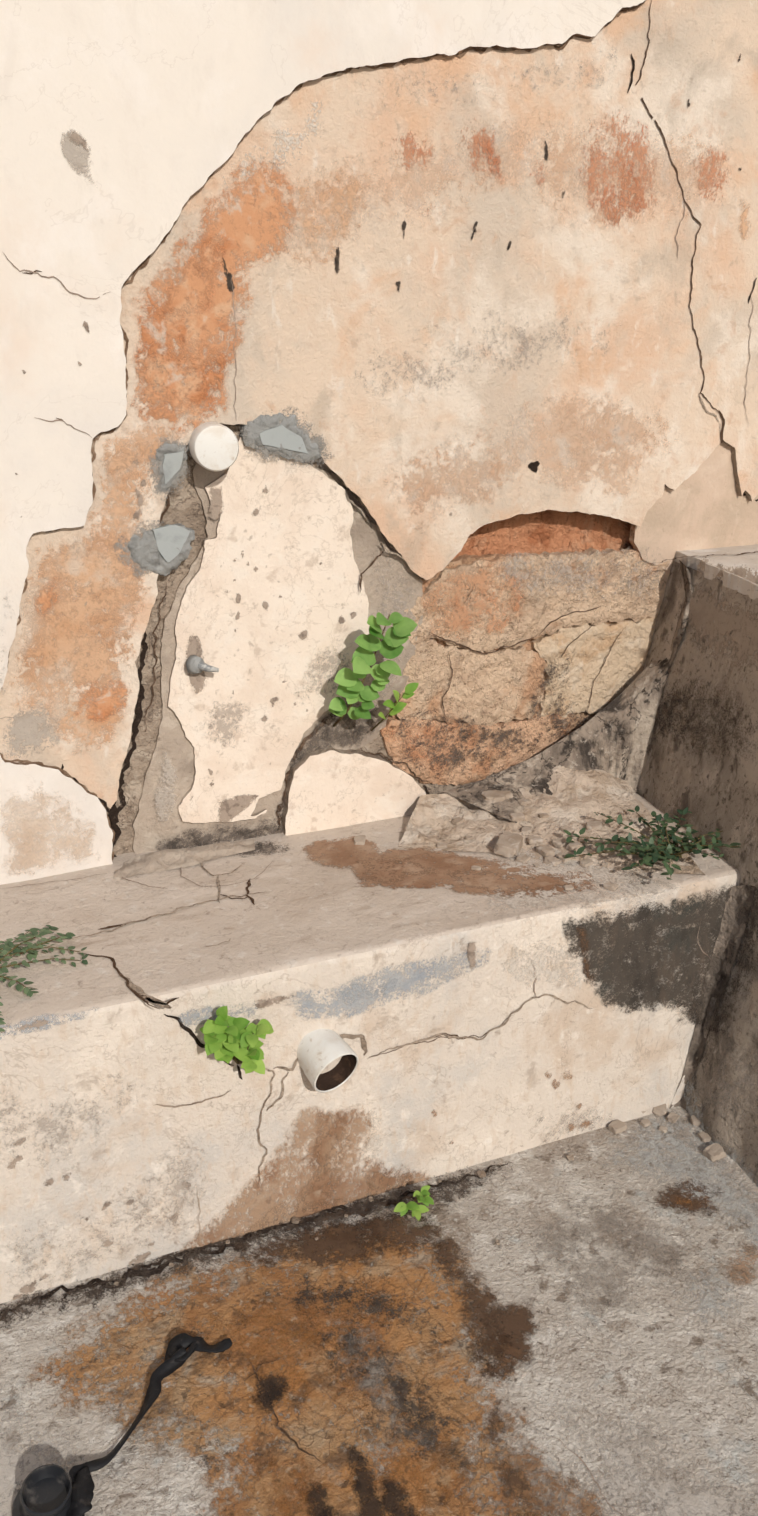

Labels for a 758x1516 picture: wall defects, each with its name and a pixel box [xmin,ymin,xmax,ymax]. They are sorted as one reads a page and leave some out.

spalling [322,54,437,77]
spalling [455,0,646,58]
crack [4,254,109,299]
crack [628,0,757,443]
spalling [91,324,129,500]
spalling [380,442,758,786]
damp [679,557,758,671]
damp [392,651,588,779]
crack [0,584,512,1329]
damp [157,819,758,1324]
crack [340,962,593,1058]
damp [31,1108,758,1516]